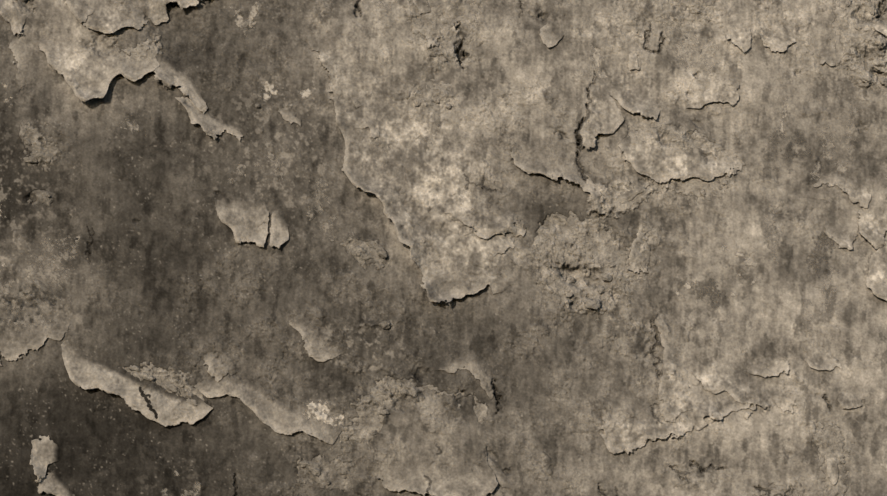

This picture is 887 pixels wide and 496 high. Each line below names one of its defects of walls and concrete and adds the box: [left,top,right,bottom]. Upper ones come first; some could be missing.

flaking render [0,0,243,141]
flaking render [214,195,289,249]
flaking render [306,0,745,322]
crack [573,73,598,181]
flaking render [812,172,887,301]
spalling [828,0,887,94]
flaking render [0,314,513,496]
flaking render [599,315,797,454]